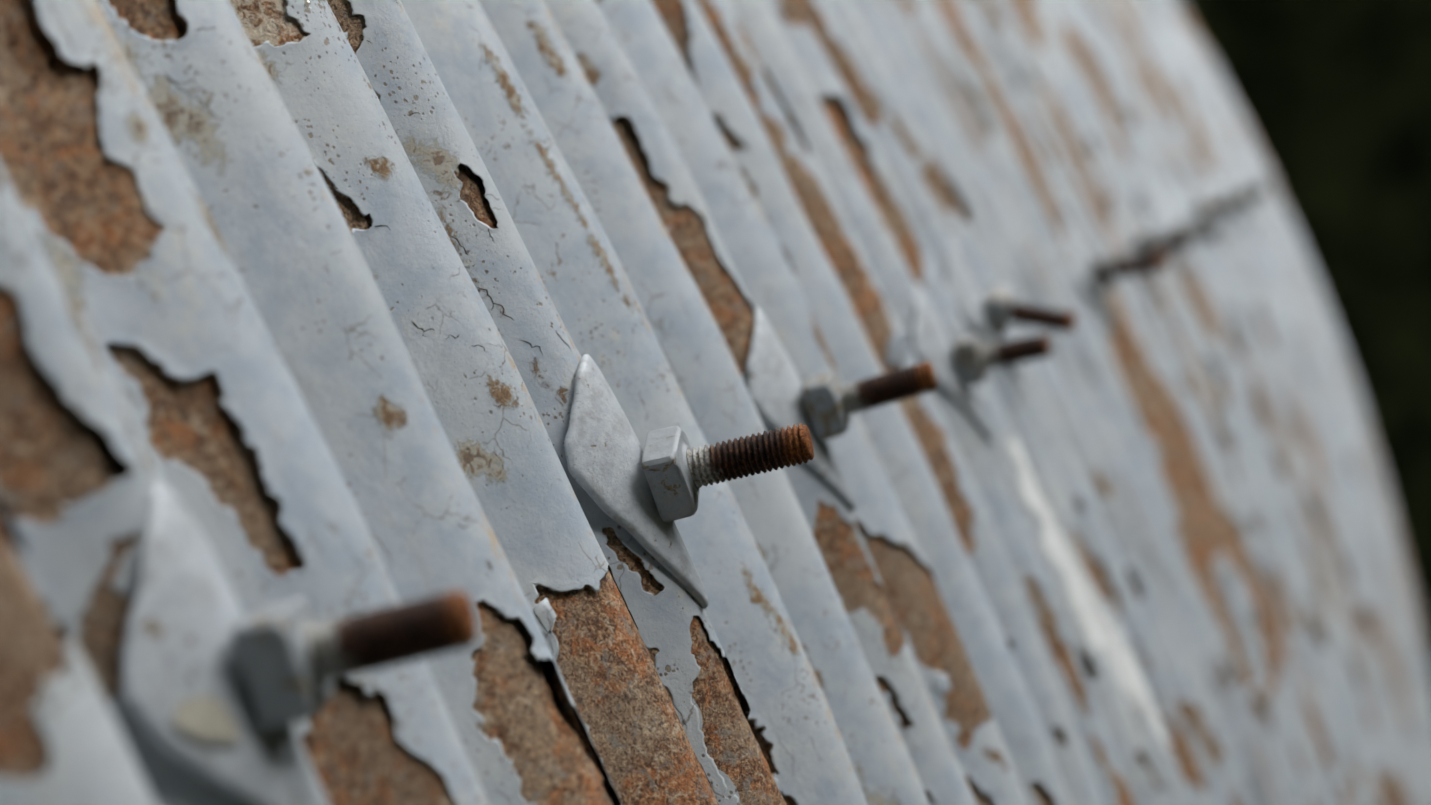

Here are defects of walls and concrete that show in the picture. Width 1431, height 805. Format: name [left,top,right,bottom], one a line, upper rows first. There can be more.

peeling [0,0,174,287]
peeling [101,0,199,50]
peeling [229,0,392,121]
peeling [600,102,754,389]
peeling [651,0,911,374]
peeling [774,0,975,305]
peeling [0,274,317,793]
peeling [296,671,465,805]
peeling [458,522,810,805]
peeling [807,496,1002,805]
peeling [898,393,977,559]